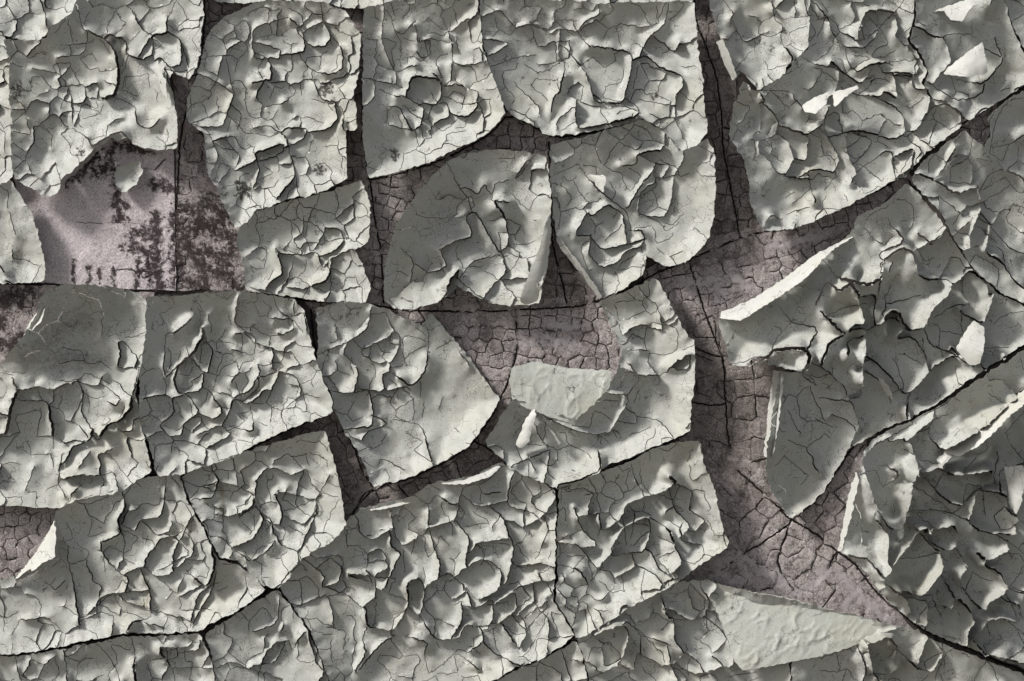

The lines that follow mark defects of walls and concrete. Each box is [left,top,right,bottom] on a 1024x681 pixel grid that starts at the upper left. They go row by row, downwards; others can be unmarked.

crack [815,86,1024,221]
crack [0,280,77,288]
crack [107,0,796,681]
peeling [643,263,669,278]
peeling [719,184,1024,453]
crack [882,345,1024,430]
crack [958,248,1024,306]
peeling [497,301,1024,681]
crack [3,550,325,678]
crack [711,446,1024,672]